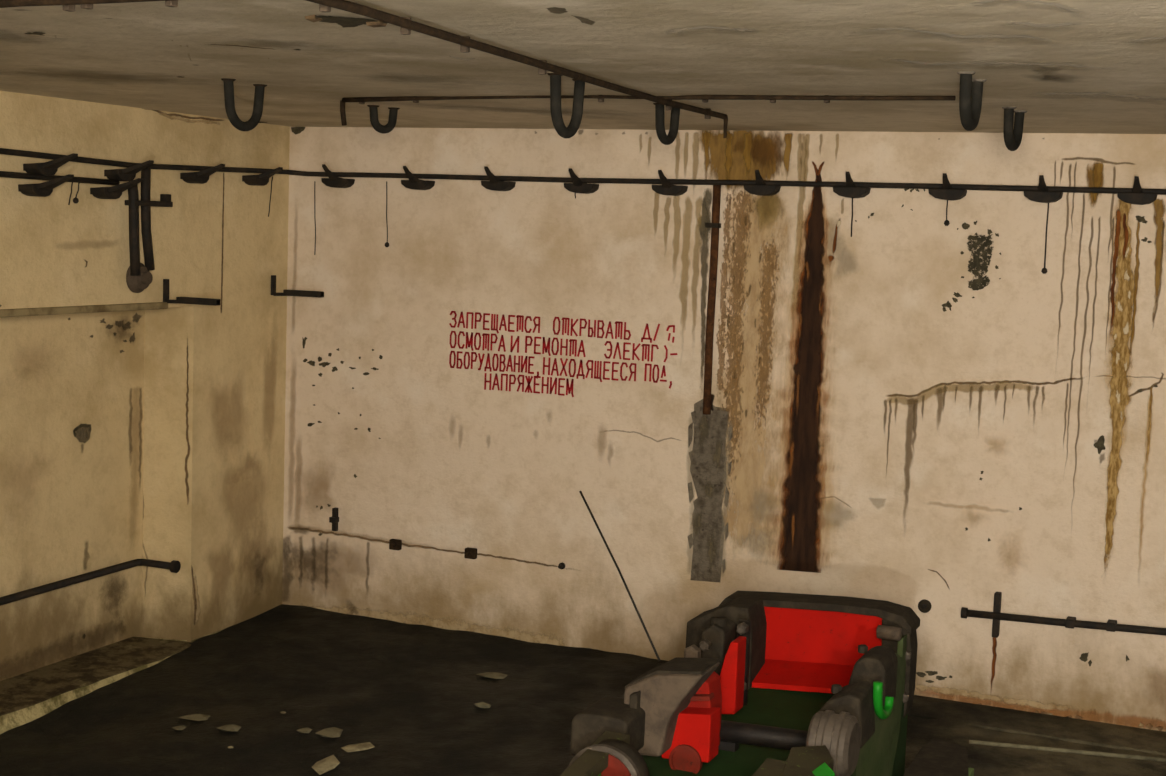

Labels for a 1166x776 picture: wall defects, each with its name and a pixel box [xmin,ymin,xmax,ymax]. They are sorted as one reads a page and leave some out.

spalling [304,15,387,28]
damp [698,130,792,545]
corrosion [779,161,841,573]
damp [942,221,1001,312]
corrosion [1104,200,1140,566]
corrosion [1152,199,1165,320]
corrosion [1140,387,1153,537]